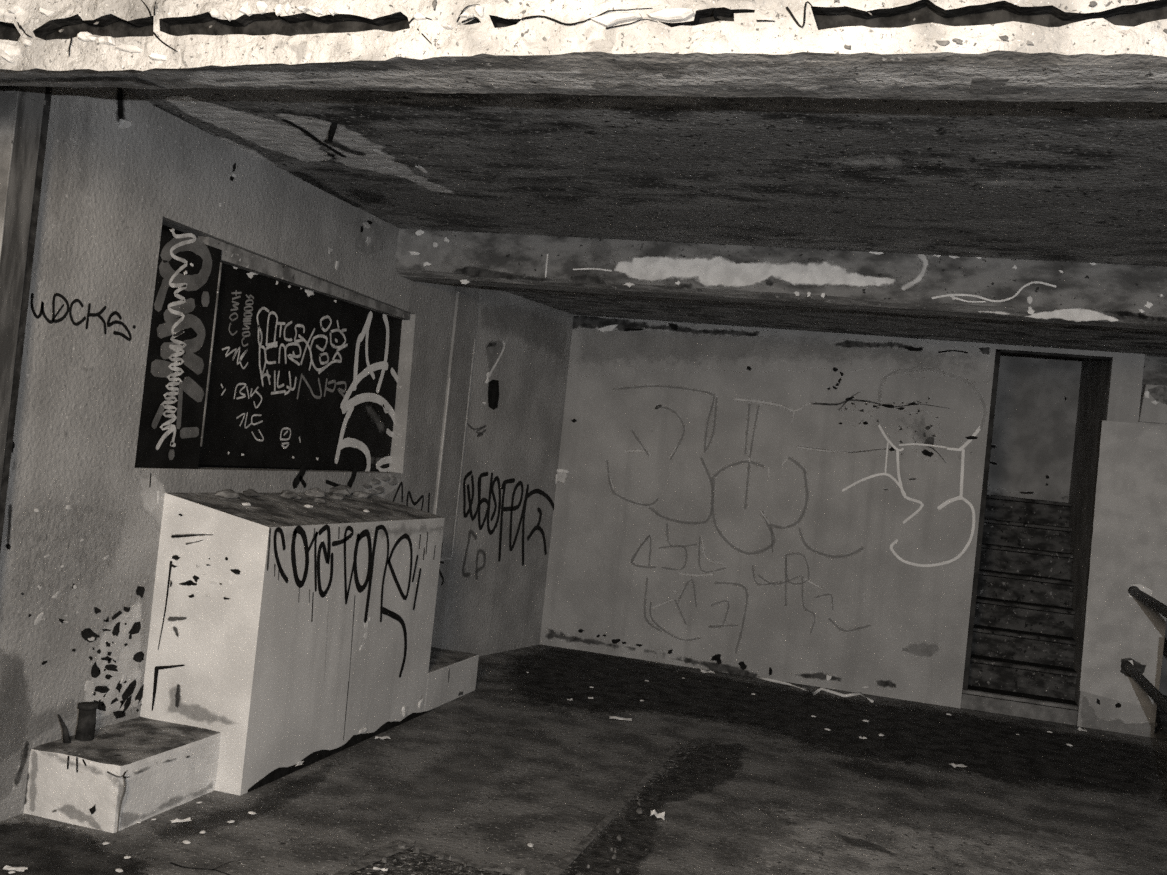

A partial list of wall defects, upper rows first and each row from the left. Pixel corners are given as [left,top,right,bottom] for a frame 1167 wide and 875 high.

crack [0,0,1167,56]
peeling [614,256,895,298]